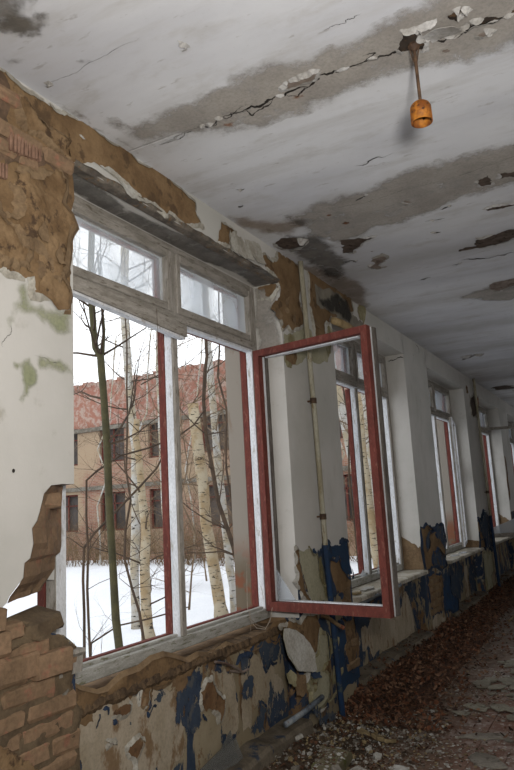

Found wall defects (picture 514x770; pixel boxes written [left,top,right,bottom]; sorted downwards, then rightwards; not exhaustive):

damp [0,0,43,33]
crack [424,12,514,43]
crack [160,51,396,145]
peeling [0,67,366,336]
spalling [459,229,514,252]
spalling [474,172,514,188]
spalling [488,278,514,291]
spalling [7,484,63,604]
peeling [464,520,495,598]
flaking render [0,591,414,770]